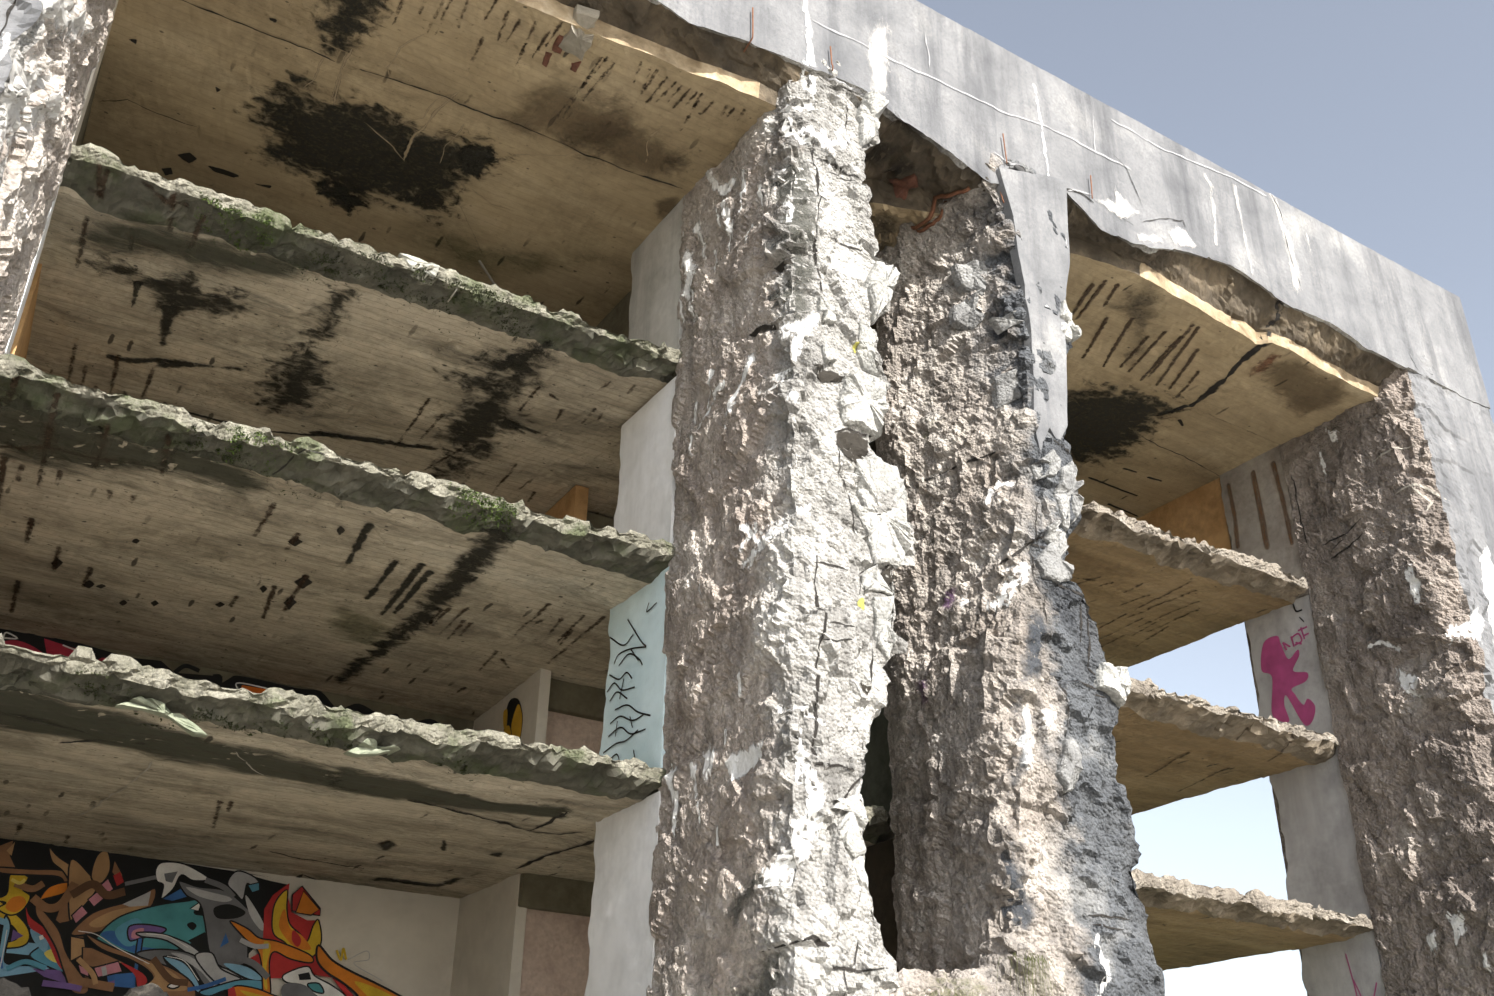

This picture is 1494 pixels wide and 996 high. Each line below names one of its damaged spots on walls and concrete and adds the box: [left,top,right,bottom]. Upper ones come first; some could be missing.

leakage [234,0,529,259]
flaking render [398,253,440,279]
crack [811,20,1363,559]
leakage [309,341,555,479]
spalling [814,364,844,382]
spalling [836,431,869,464]
leakage [1064,382,1190,466]
leakage [335,517,519,683]
crack [811,428,889,810]
flaking render [114,696,208,737]
flaking render [343,738,400,757]
crack [762,934,885,996]